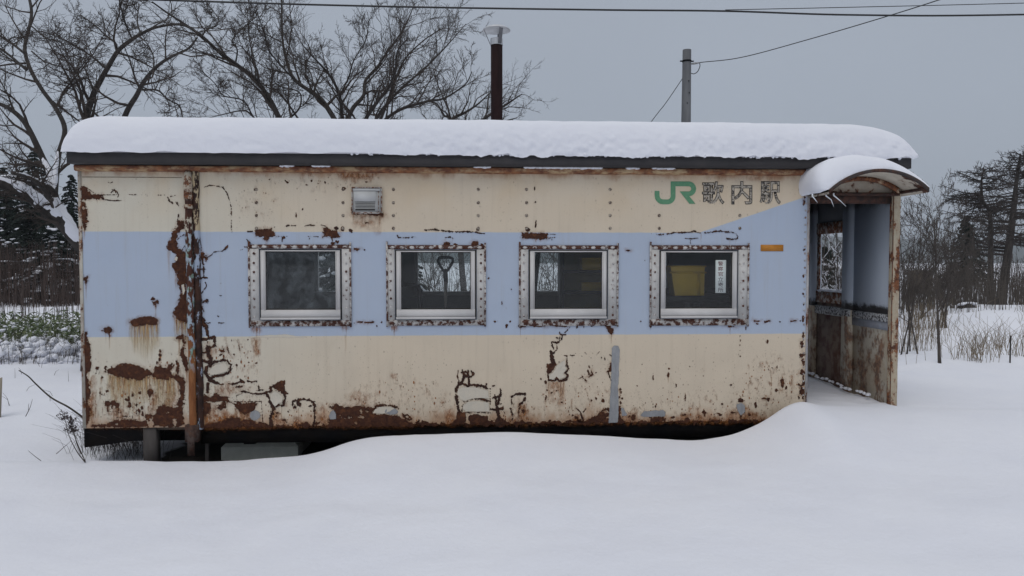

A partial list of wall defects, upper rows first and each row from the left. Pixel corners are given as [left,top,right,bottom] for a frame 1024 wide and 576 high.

rust [81,186,121,230]
rust [84,220,805,430]